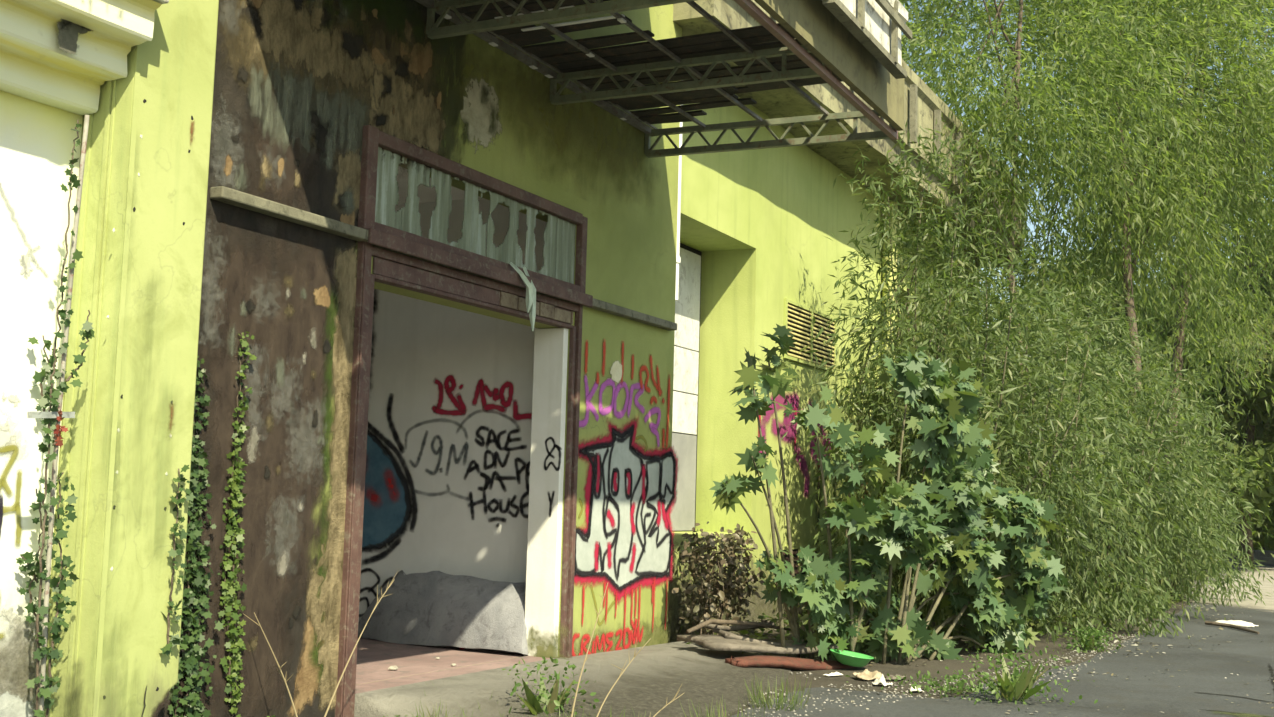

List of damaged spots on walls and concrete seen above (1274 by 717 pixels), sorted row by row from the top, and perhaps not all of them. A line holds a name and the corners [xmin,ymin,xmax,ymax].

flaking render [224,0,502,226]
flaking render [247,416,280,479]
flaking render [285,247,358,717]
flaking render [279,551,287,575]
spalling [0,607,49,717]